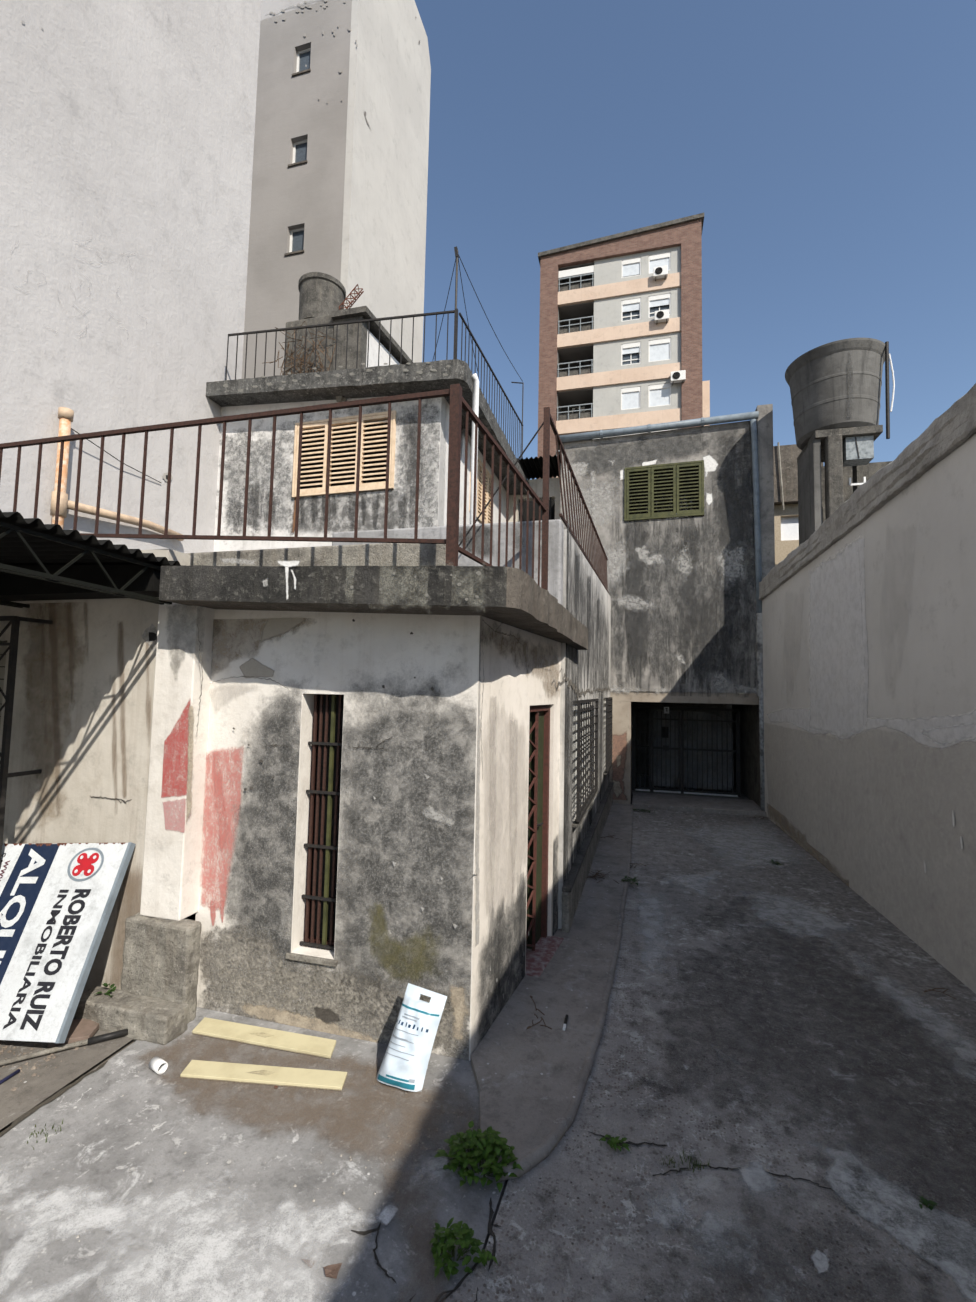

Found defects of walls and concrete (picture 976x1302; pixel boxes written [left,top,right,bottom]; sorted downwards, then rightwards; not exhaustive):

water stain [210,691,311,971]
water stain [334,686,529,1040]
water stain [459,527,490,556]
water stain [480,430,757,935]